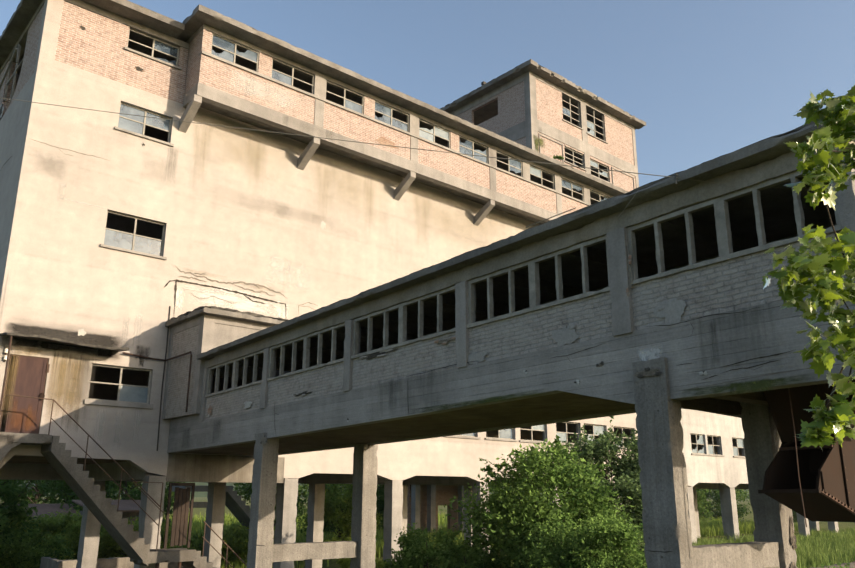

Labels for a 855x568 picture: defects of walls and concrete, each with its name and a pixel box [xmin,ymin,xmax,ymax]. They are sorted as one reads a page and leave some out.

crack [164,270,318,314]
crack [677,349,802,390]